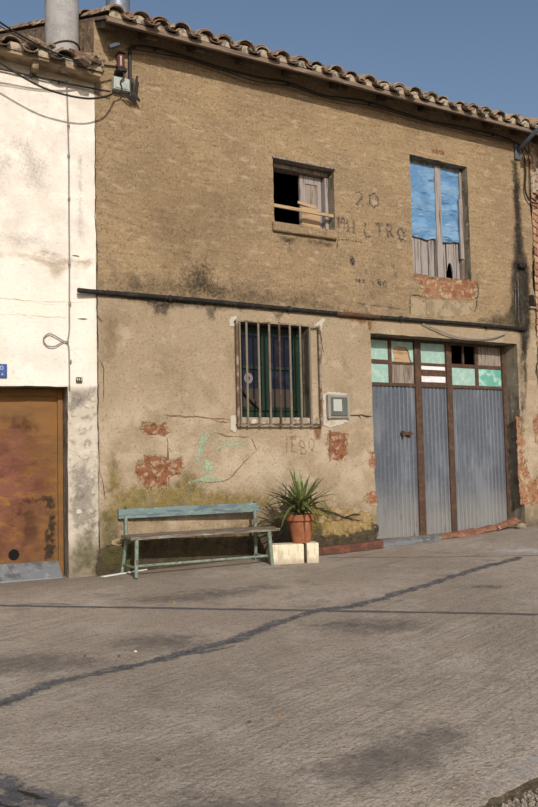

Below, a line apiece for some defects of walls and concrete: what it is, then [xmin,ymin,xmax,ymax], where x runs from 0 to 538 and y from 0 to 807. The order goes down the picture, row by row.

flaking render [410,274,478,318]
water stain [497,162,530,381]
corrosion [0,423,56,560]
flaking render [139,421,172,438]
flaking render [135,455,186,490]
flaking render [323,392,350,461]
flaking render [516,414,538,505]
crack [0,555,538,707]
crack [0,773,84,807]